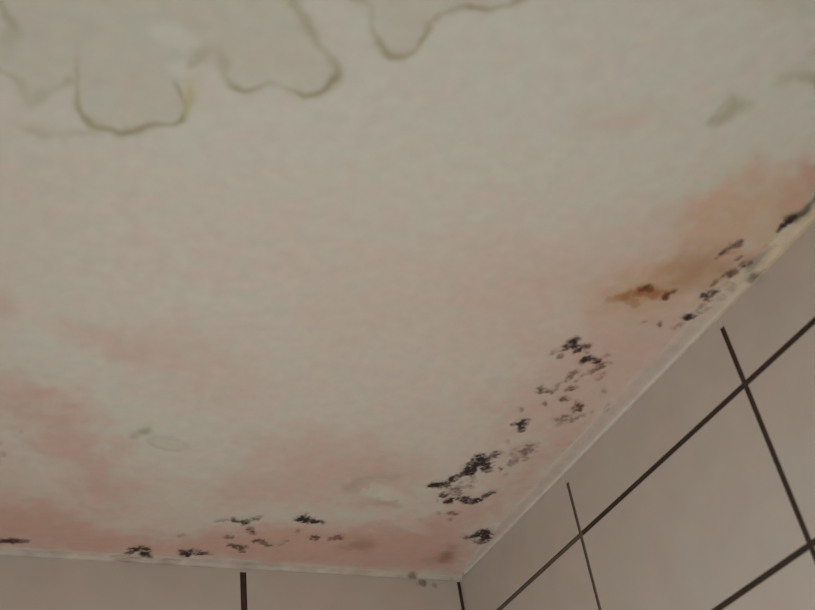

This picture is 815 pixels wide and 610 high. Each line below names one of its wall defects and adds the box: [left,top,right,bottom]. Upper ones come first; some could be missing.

water stain [0,0,537,147]
corrosion [573,233,756,331]
water stain [0,133,815,590]